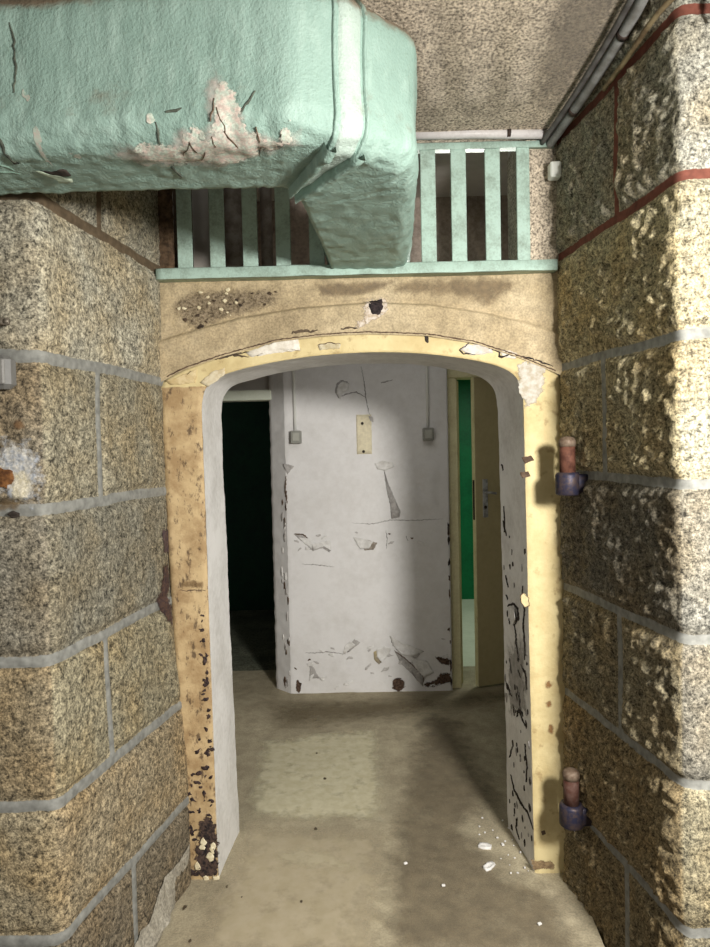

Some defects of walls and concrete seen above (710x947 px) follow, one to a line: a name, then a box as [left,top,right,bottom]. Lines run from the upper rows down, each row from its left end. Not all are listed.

crack [9,22,18,93]
crack [0,139,19,164]
peeling [119,80,293,167]
spalling [355,298,388,329]
peeling [247,339,300,357]
peeling [459,343,546,406]
peeling [353,532,394,551]
peeling [284,636,452,688]
damp [280,643,526,722]
crack [503,506,533,847]
damp [396,719,567,947]